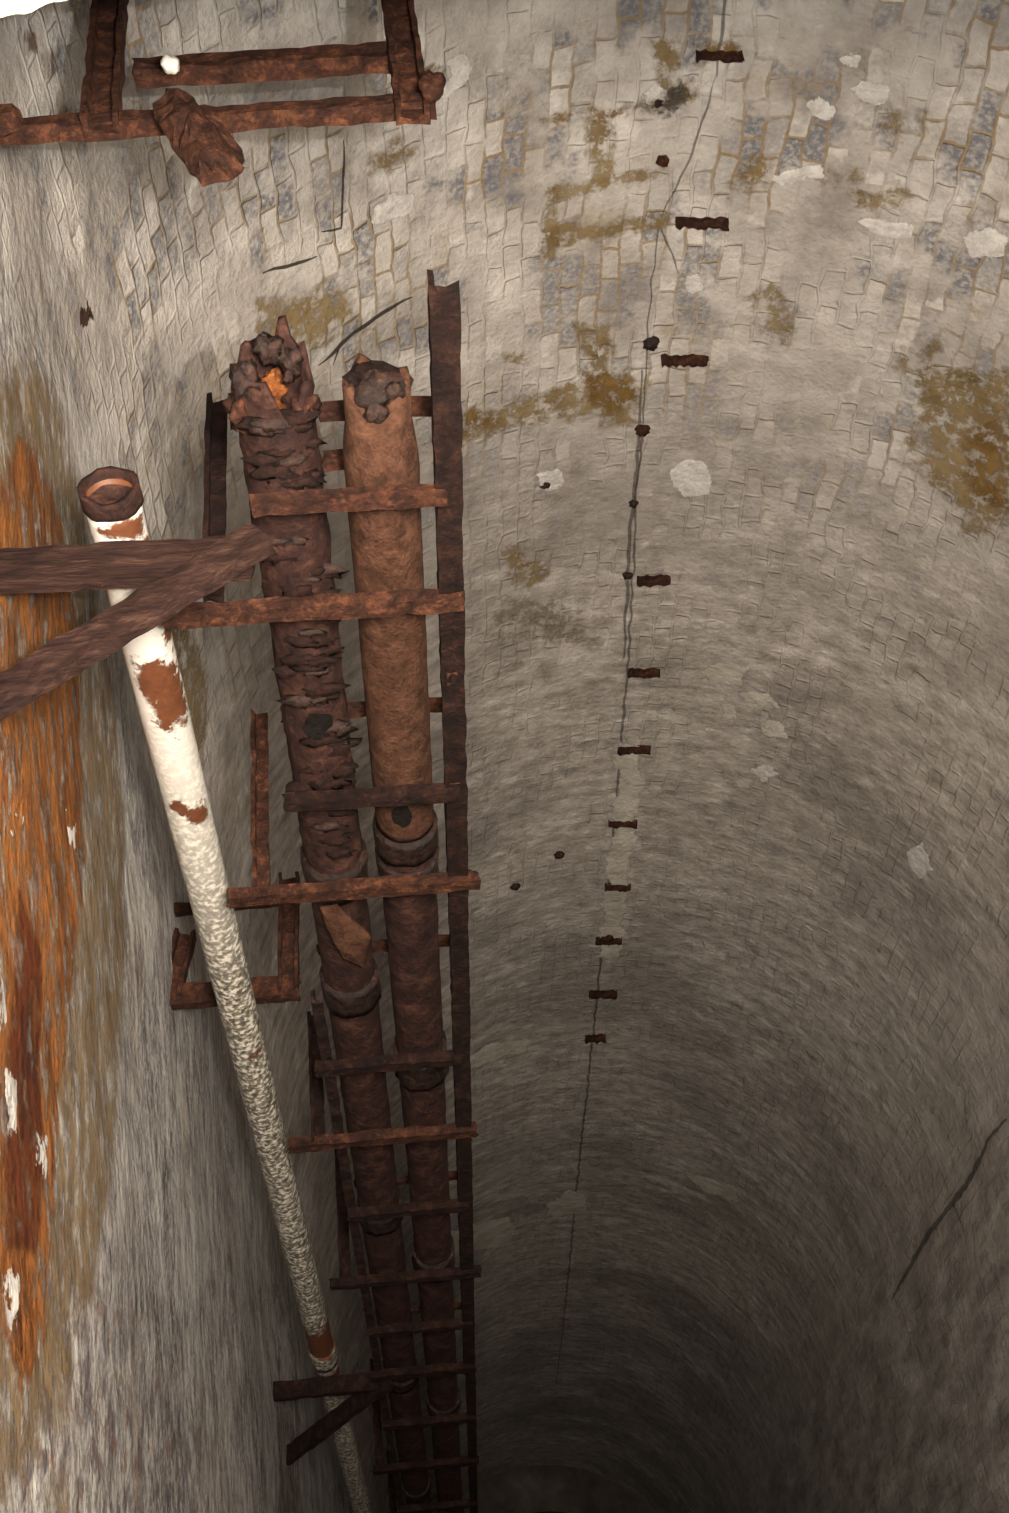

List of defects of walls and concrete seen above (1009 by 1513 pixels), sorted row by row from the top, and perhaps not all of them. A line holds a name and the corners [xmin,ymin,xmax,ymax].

damp [544,41,696,260]
rust [0,365,87,549]
damp [462,323,641,443]
damp [900,341,1009,533]
rust [0,589,97,673]
rust [0,658,125,1489]